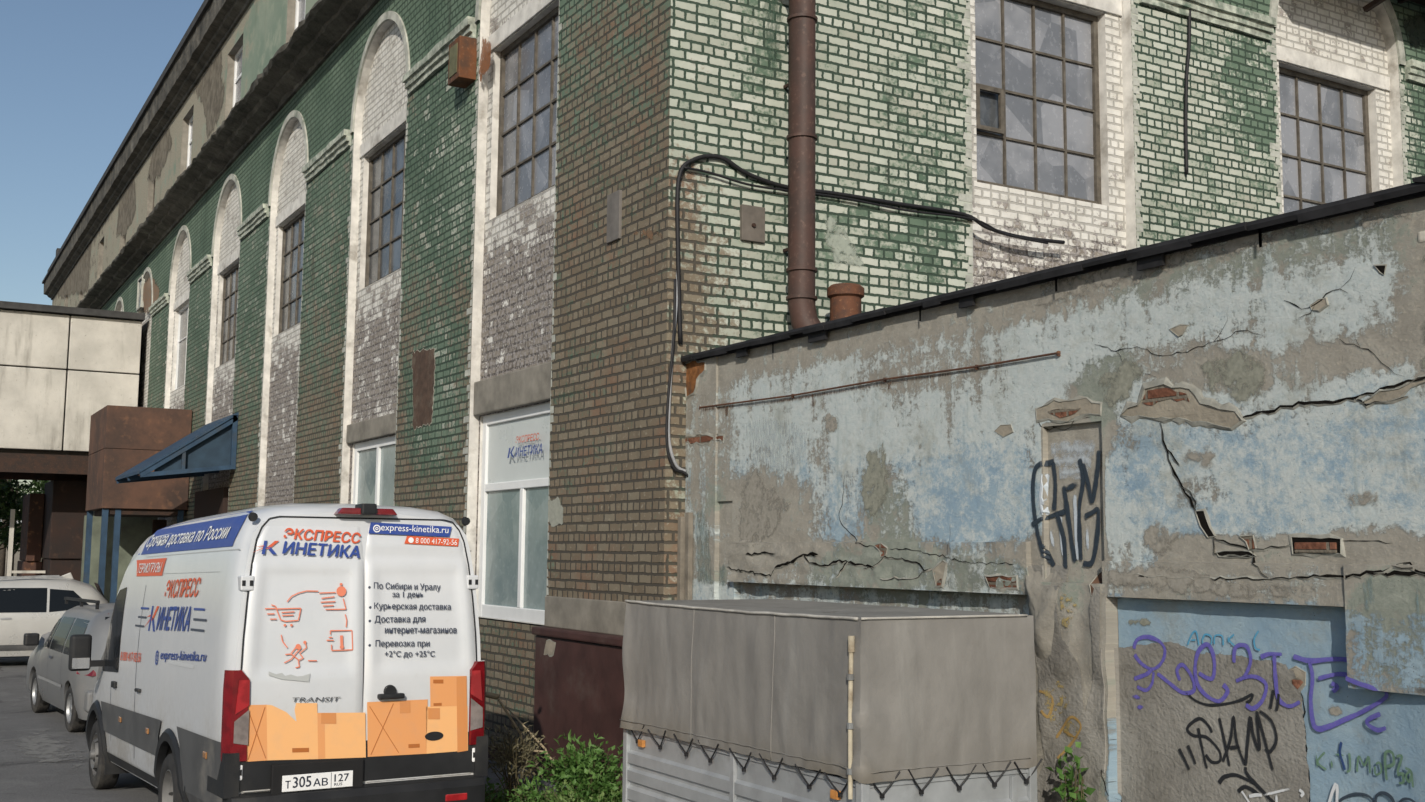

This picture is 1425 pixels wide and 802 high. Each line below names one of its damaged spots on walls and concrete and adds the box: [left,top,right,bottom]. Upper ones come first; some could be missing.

corrosion [699,351,1061,415]
spalling [1035,349,1265,431]
crack [727,476,1012,581]
crack [1133,423,1425,582]
spalling [1288,666,1306,692]